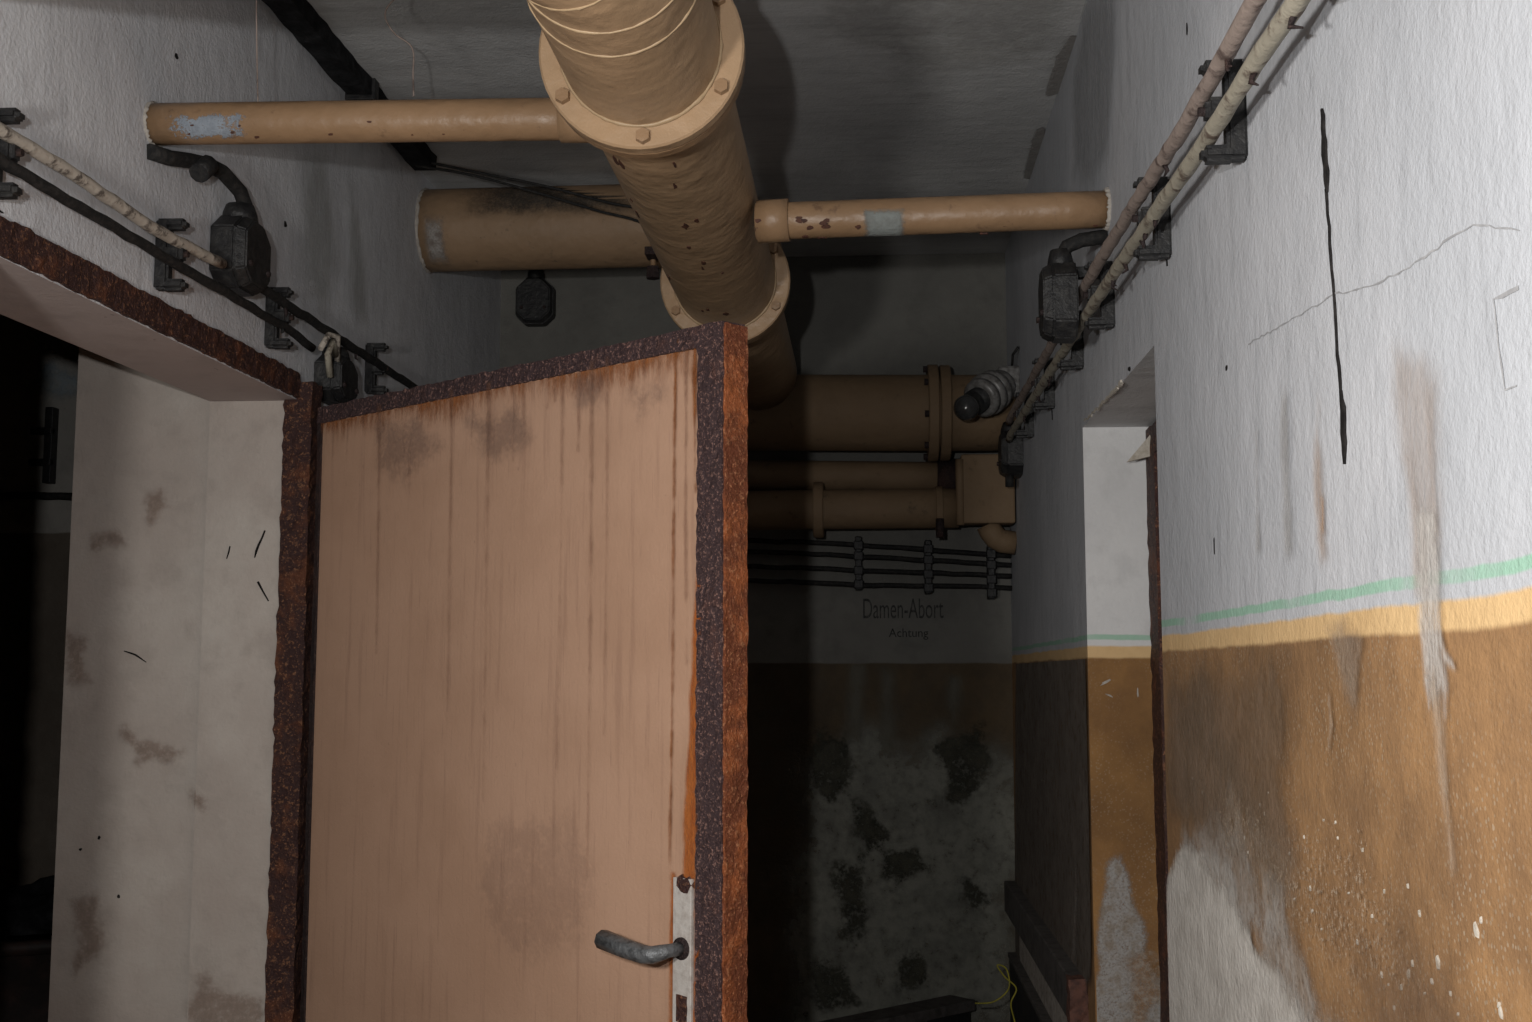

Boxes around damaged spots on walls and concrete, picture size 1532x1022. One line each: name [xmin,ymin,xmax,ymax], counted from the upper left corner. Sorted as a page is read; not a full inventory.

crack [1248,108,1520,464]
efflorescence [1418,514,1452,793]
mould [808,733,924,940]
peeling [785,664,1067,1022]
mould [935,729,991,803]
peeling [1096,858,1160,1022]
peeling [1423,955,1459,1016]